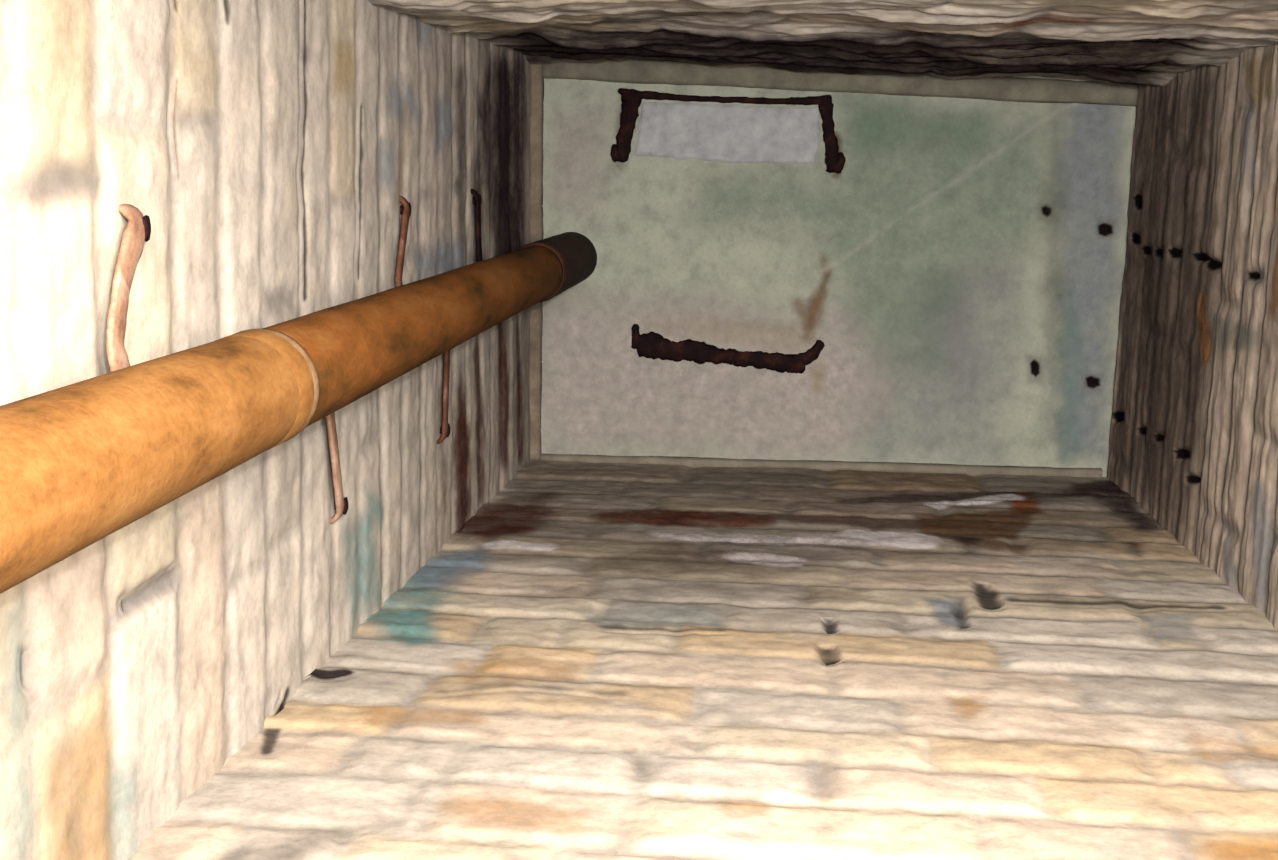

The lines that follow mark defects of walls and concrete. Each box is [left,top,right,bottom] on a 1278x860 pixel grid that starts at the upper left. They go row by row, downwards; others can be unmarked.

damp [475,29,1184,256]
corrosion [598,510,773,527]
corrosion [917,492,1040,550]